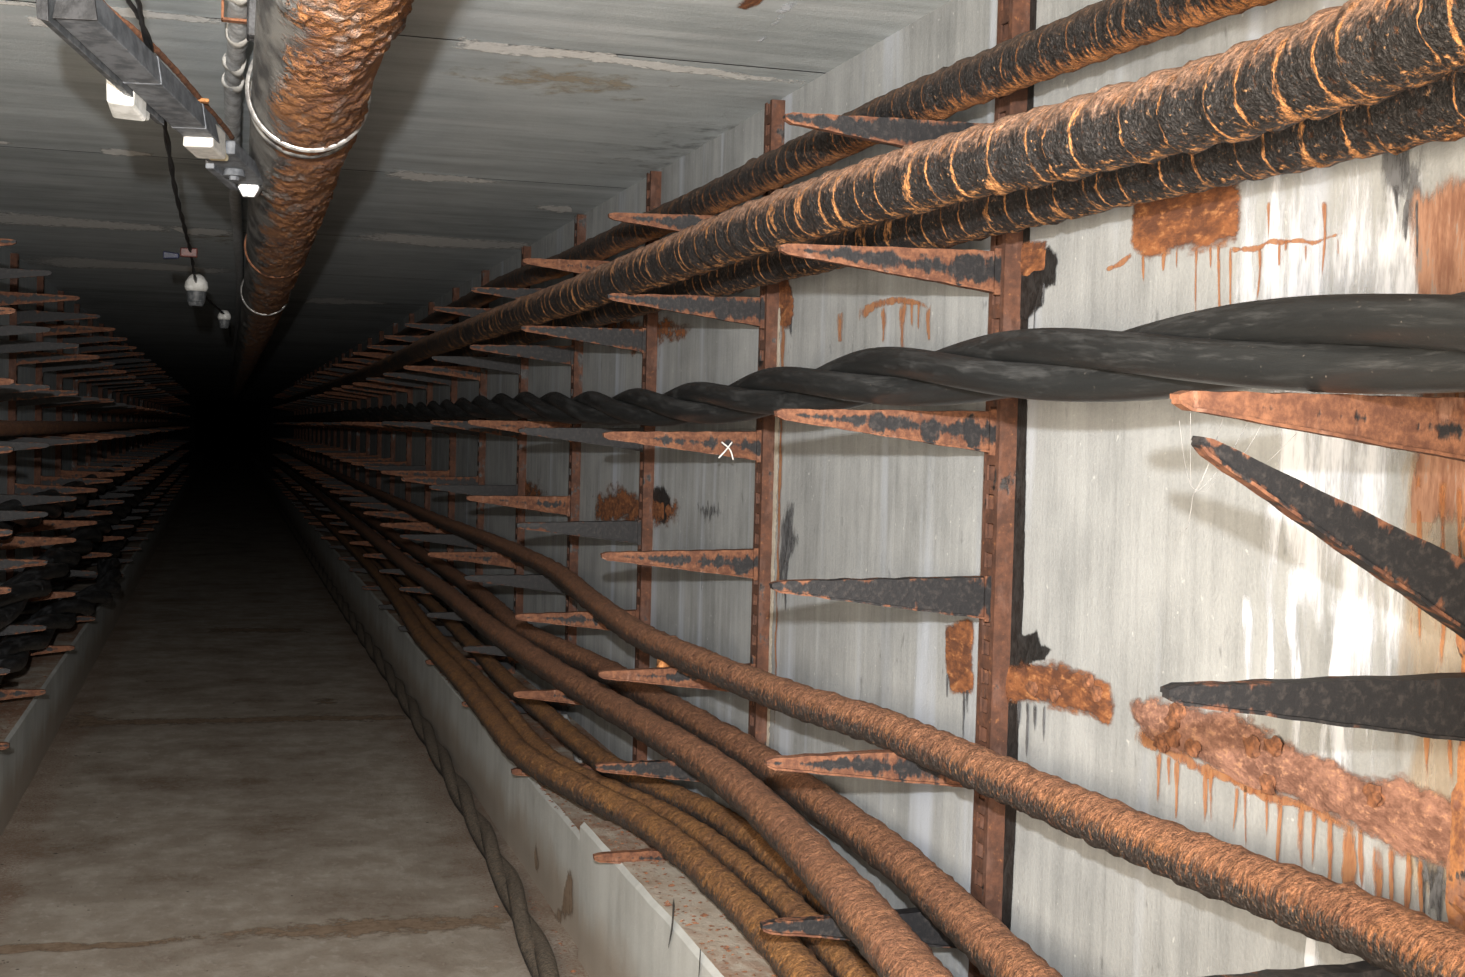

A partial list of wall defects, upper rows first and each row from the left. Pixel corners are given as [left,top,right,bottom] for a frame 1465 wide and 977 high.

rust [738,0,763,9]
rust [1107,185,1240,311]
rust [1412,180,1465,295]
rust [862,297,930,347]
rust [595,486,678,527]
rust [1408,452,1465,558]
rust [945,619,974,735]
rust [1006,662,1114,755]